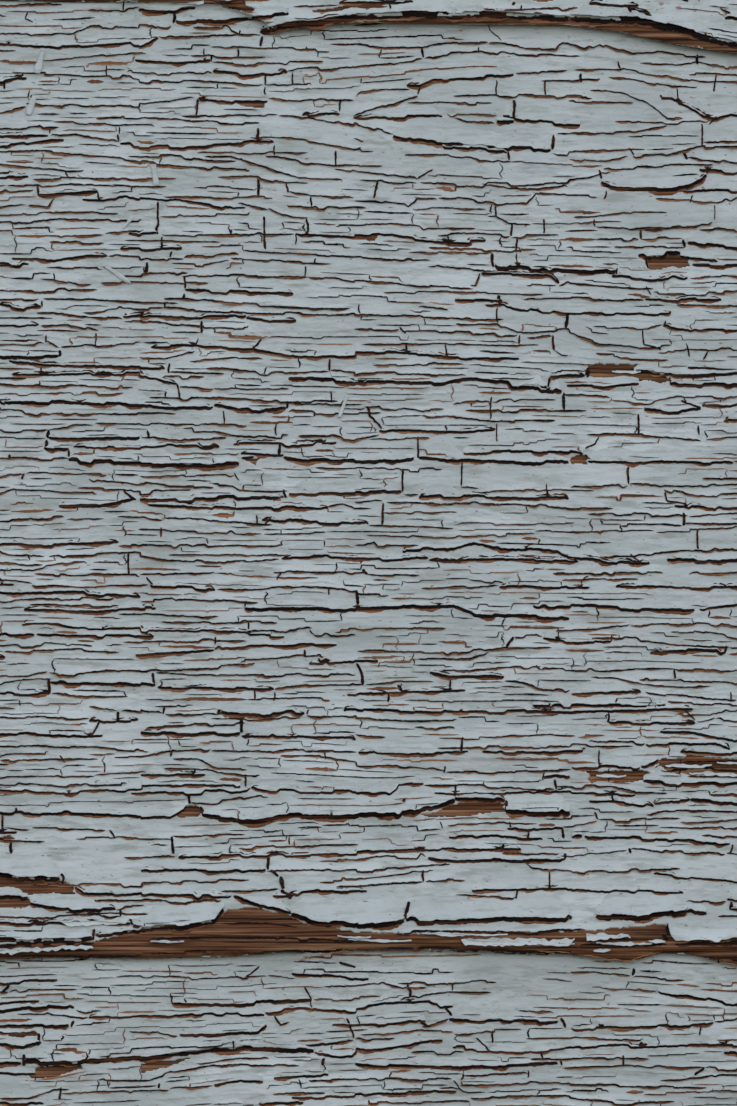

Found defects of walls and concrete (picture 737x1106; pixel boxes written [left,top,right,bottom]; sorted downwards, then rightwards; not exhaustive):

peeling [19,0,737,53]
peeling [0,301,43,328]
peeling [455,233,737,334]
peeling [0,310,737,423]
crack [0,0,737,876]
peeling [146,576,215,593]
peeling [0,581,378,665]
peeling [650,645,727,656]
peeling [0,668,737,1106]
crack [0,853,737,1106]